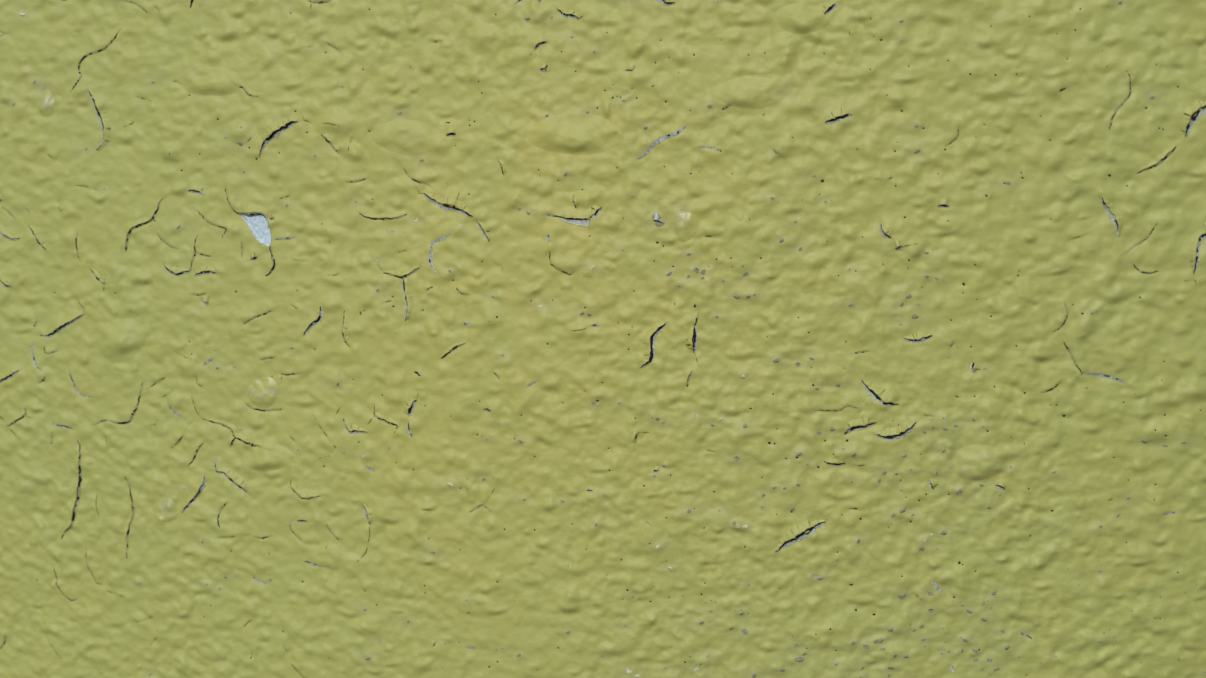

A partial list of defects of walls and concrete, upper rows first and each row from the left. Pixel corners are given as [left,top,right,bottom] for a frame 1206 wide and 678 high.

crack [70,0,159,151]
crack [238,118,367,183]
crack [1137,100,1206,173]
crack [123,185,295,305]
peeling [225,188,276,276]
crack [544,195,602,275]
crack [1101,196,1157,275]
crack [291,167,491,458]
crack [640,311,699,387]
crack [0,236,350,639]
crack [822,351,934,466]
crack [775,507,857,553]